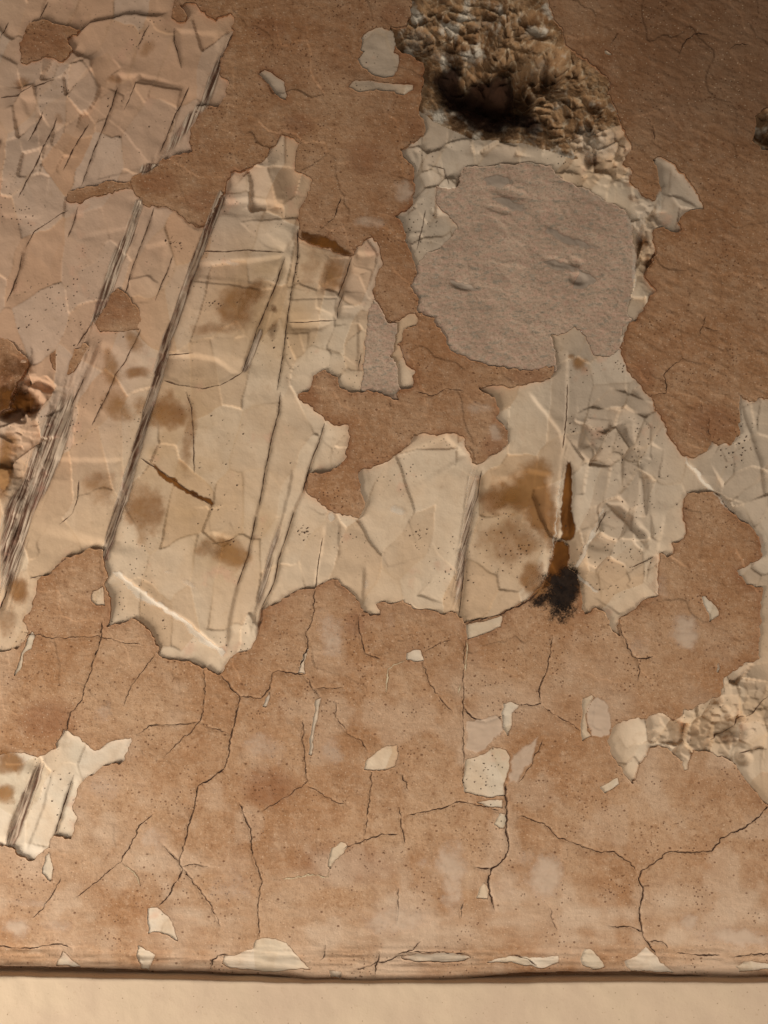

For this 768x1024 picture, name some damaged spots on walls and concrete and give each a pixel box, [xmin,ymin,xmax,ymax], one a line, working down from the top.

spalling [0,0,768,805]
corrosion [483,463,575,592]
crack [27,624,152,731]
spalling [0,730,132,881]
crack [34,815,152,917]
crack [144,591,366,924]
crack [239,593,768,957]
crack [358,941,463,972]